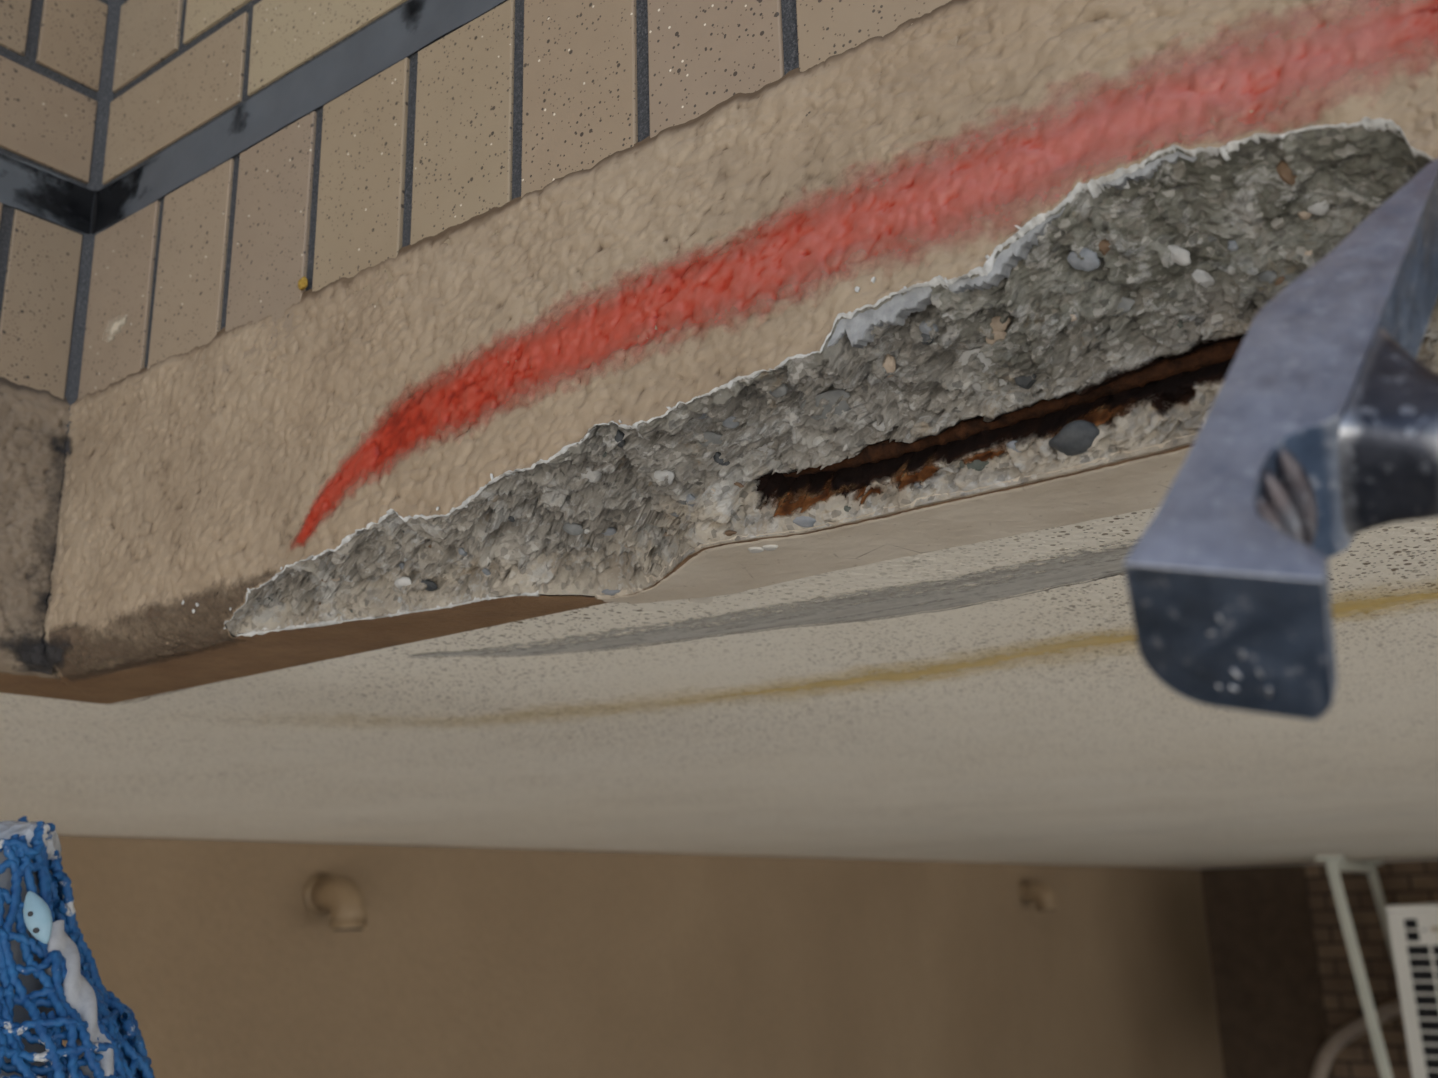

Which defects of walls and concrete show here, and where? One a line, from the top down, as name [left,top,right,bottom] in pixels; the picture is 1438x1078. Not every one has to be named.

water stain [52,437,72,462]
spalling [223,117,1438,637]
corrosion [756,334,1246,517]
water stain [0,637,71,675]